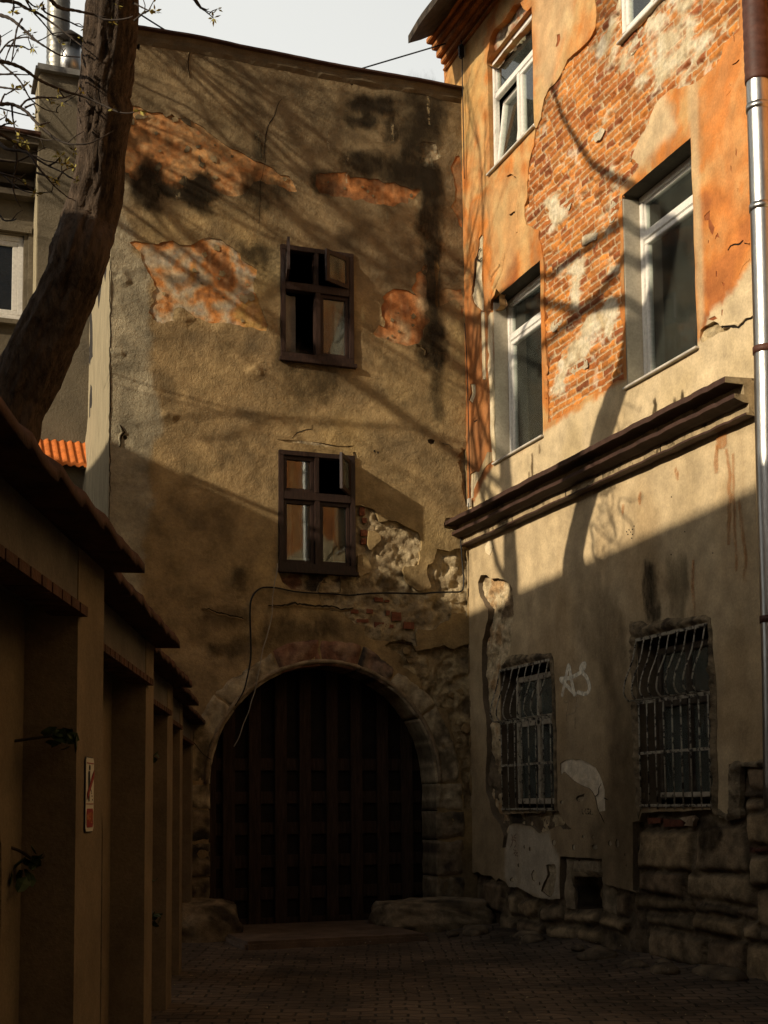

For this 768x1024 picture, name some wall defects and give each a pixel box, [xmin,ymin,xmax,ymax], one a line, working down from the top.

peeling [130,238,268,331]
peeling [125,106,297,196]
peeling [316,172,421,207]
water stain [346,93,447,368]
peeling [373,236,508,503]
flaking render [525,0,740,422]
flaking render [701,310,753,342]
flaking render [279,506,471,809]
flaking render [483,575,608,833]